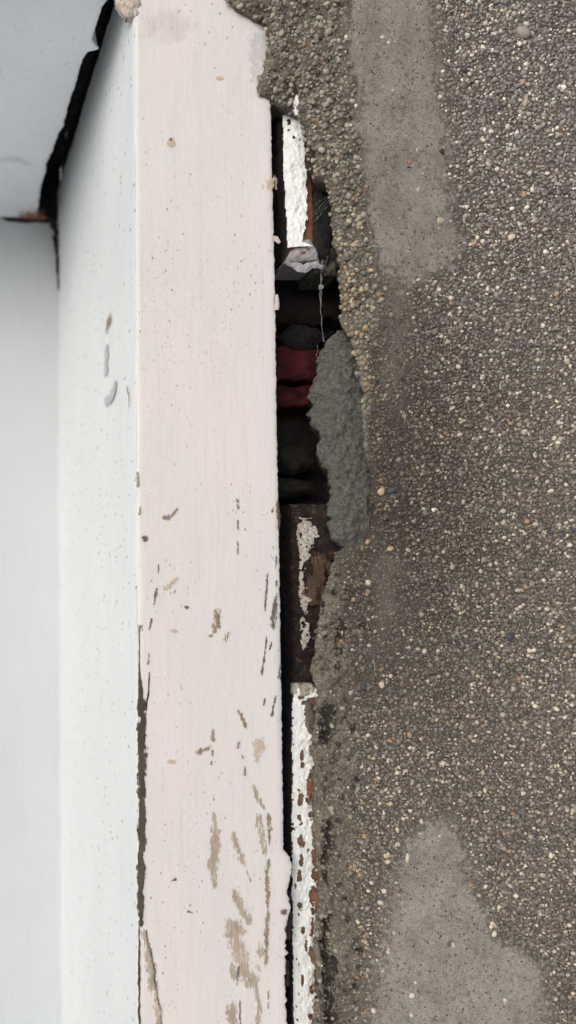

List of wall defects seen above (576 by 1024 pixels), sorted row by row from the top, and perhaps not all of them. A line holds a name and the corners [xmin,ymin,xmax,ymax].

peeling [285,261,323,273]
spalling [279,330,372,682]
peeling [136,630,150,1024]
peeling [195,729,215,765]